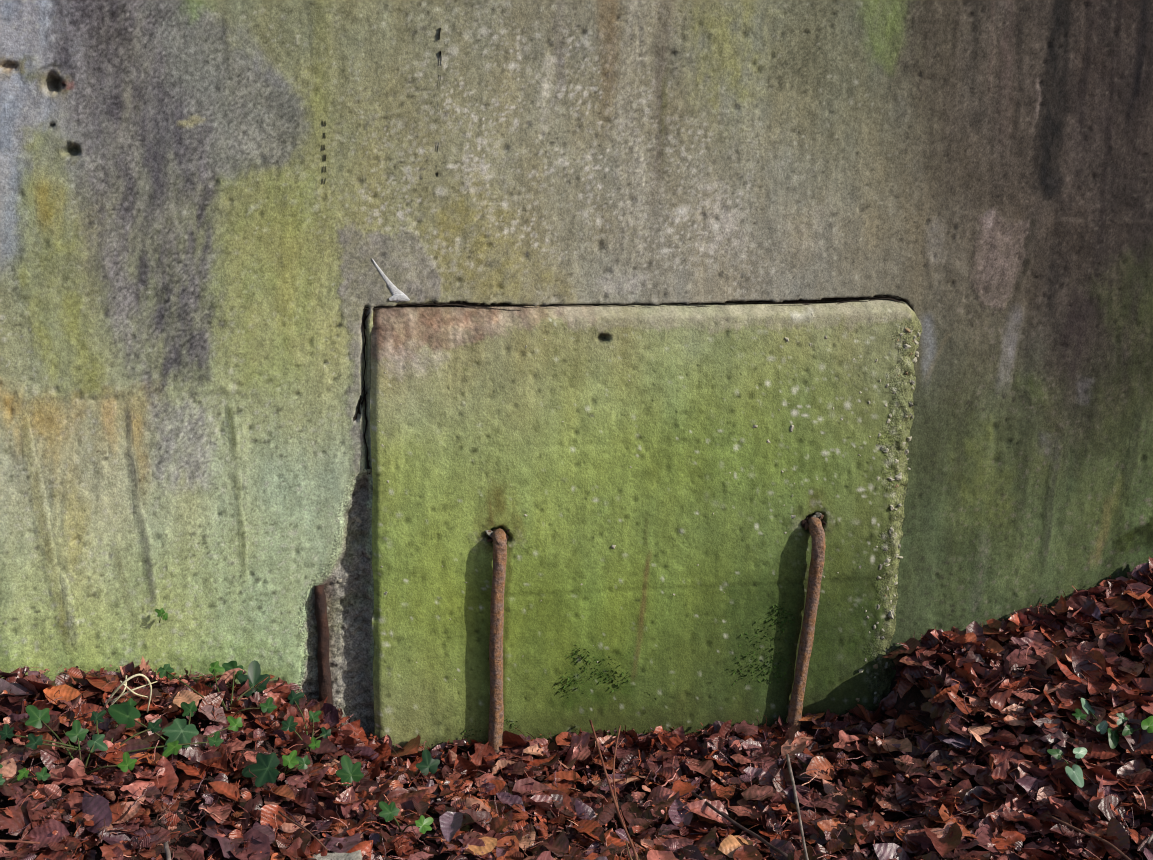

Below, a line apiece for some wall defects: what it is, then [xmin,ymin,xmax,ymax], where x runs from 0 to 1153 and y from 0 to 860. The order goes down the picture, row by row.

damp [0,0,340,655]
damp [562,0,1153,676]
damp [394,711,489,755]
corrosion [465,471,532,719]
damp [503,628,788,754]
corrosion [784,475,838,708]
damp [802,676,878,717]